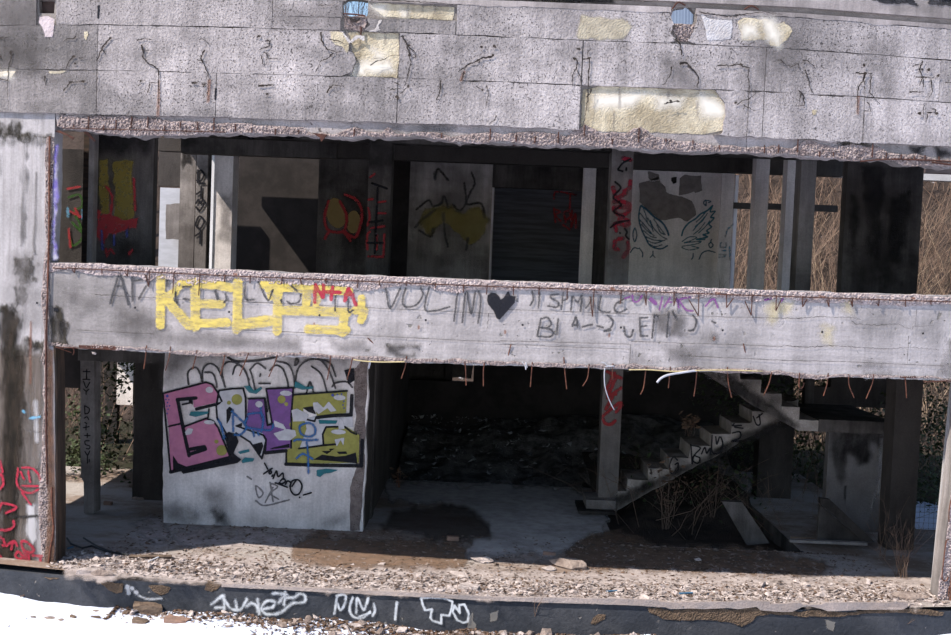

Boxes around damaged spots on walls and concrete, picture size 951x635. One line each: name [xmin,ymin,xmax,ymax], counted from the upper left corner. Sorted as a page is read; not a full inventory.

crack [136,38,159,115]
crack [191,39,210,101]
peeling [331,3,454,78]
crack [436,45,497,123]
crack [662,38,757,150]
peeling [664,2,792,46]
crack [856,64,880,139]
crack [909,61,951,122]
spalling [38,86,951,580]
damp [0,349,44,561]
spalling [101,581,123,594]
spalling [647,496,951,631]